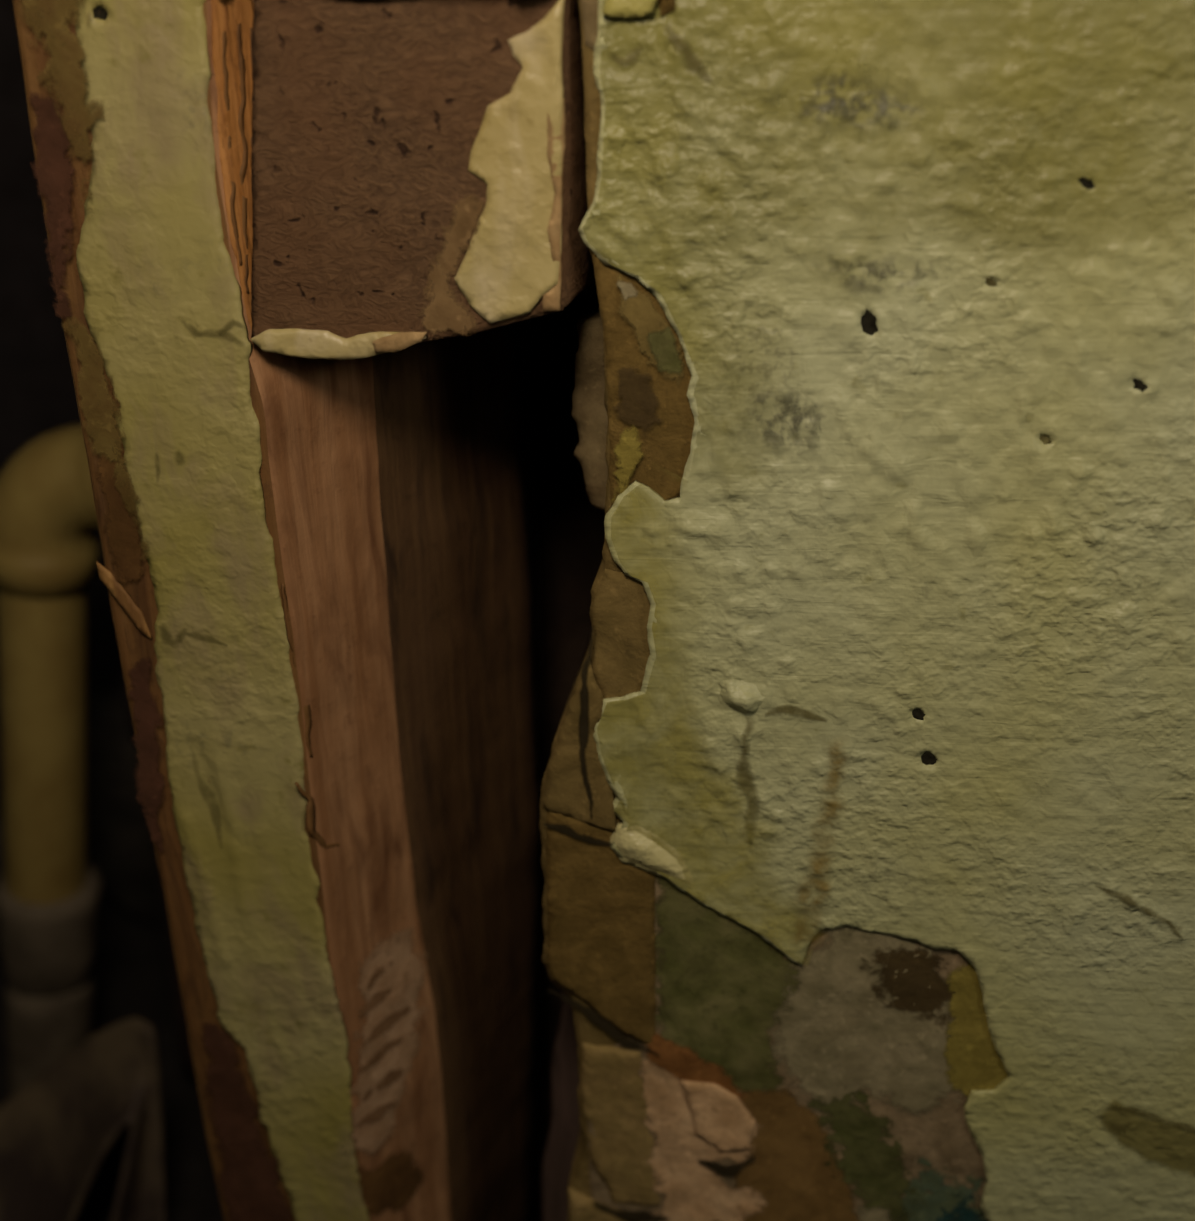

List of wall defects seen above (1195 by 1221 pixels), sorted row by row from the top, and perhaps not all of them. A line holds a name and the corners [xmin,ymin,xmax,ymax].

peeling [454,0,565,323]
peeling [580,0,676,210]
peeling [21,0,153,639]
peeling [372,331,427,353]
peeling [572,251,695,512]
peeling [128,657,165,852]
peeling [542,568,1008,1221]
peeling [1103,1101,1195,1174]